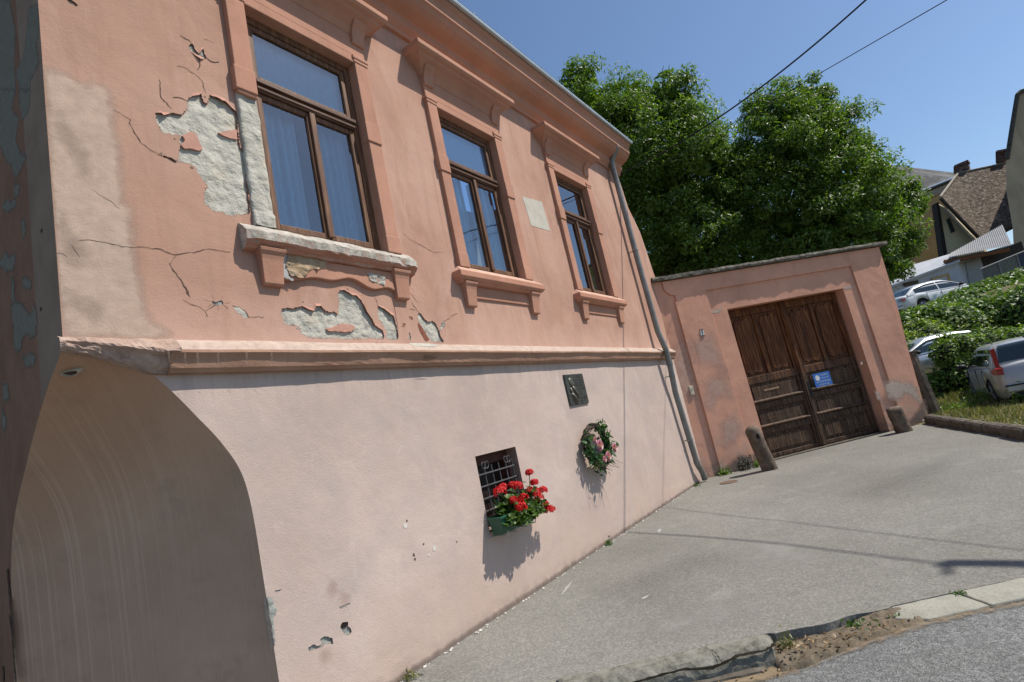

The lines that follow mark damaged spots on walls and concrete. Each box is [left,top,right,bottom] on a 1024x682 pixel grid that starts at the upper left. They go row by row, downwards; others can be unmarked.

flaking render [155,92,276,229]
crack [61,240,226,316]
flaking render [284,254,327,281]
flaking render [368,273,386,285]
flaking render [281,284,457,358]
flaking render [308,622,352,652]